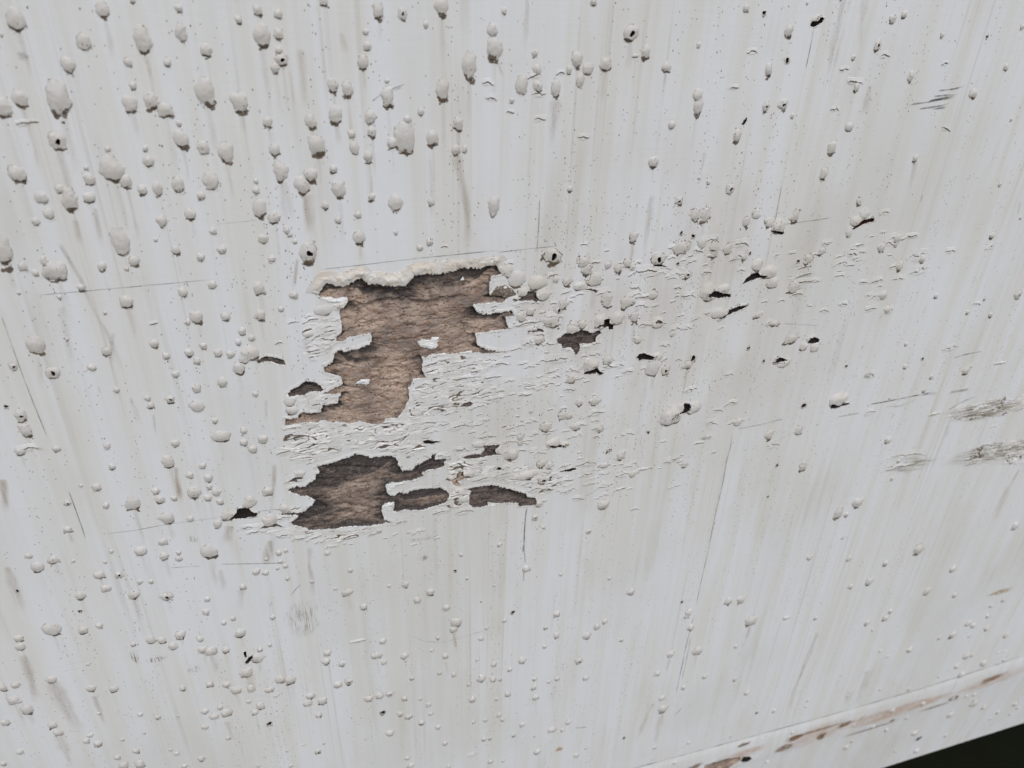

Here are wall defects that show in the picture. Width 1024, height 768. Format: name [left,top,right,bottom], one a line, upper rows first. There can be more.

peeling [282,255,526,427]
spalling [229,508,258,520]
peeling [279,440,543,532]